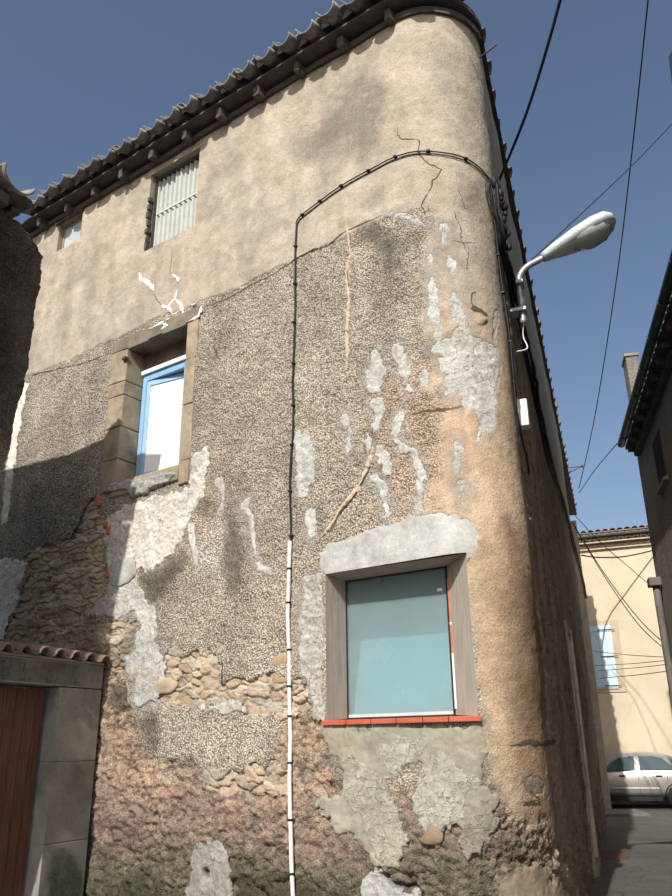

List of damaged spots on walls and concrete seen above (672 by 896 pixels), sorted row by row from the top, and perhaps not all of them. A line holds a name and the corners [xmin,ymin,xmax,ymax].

crack [397,127,442,216]
crack [139,214,386,371]
peeling [446,255,457,274]
peeling [426,277,501,374]
peeling [0,383,29,529]
crack [318,443,375,541]
peeling [340,414,354,454]
peeling [364,397,386,456]
spalling [0,496,311,722]
spalling [202,758,295,799]
peeling [339,736,500,869]
crack [510,739,556,747]